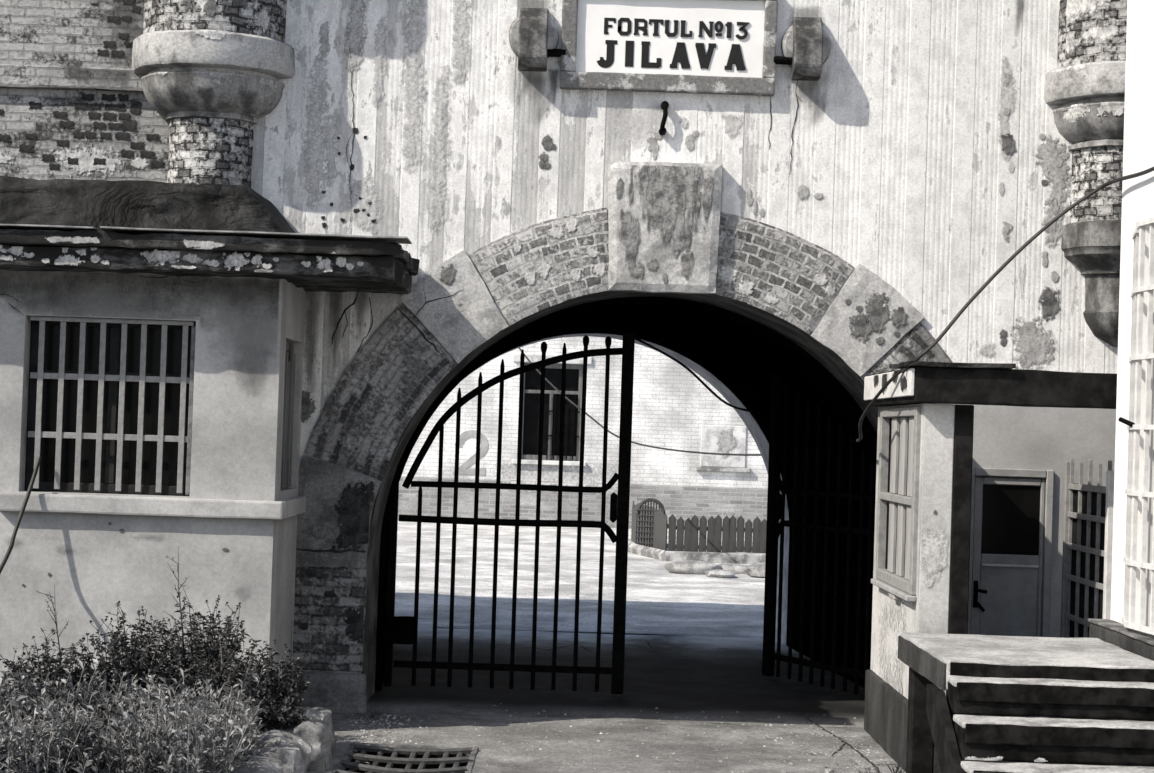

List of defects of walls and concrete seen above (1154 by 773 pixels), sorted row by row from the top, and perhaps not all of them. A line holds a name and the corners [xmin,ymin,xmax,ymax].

flaking render [97,0,141,58]
peeling [184,0,272,40]
flaking render [0,93,164,170]
crack [346,38,355,229]
peeling [0,236,109,266]
peeling [140,239,279,273]
peeling [301,252,364,272]